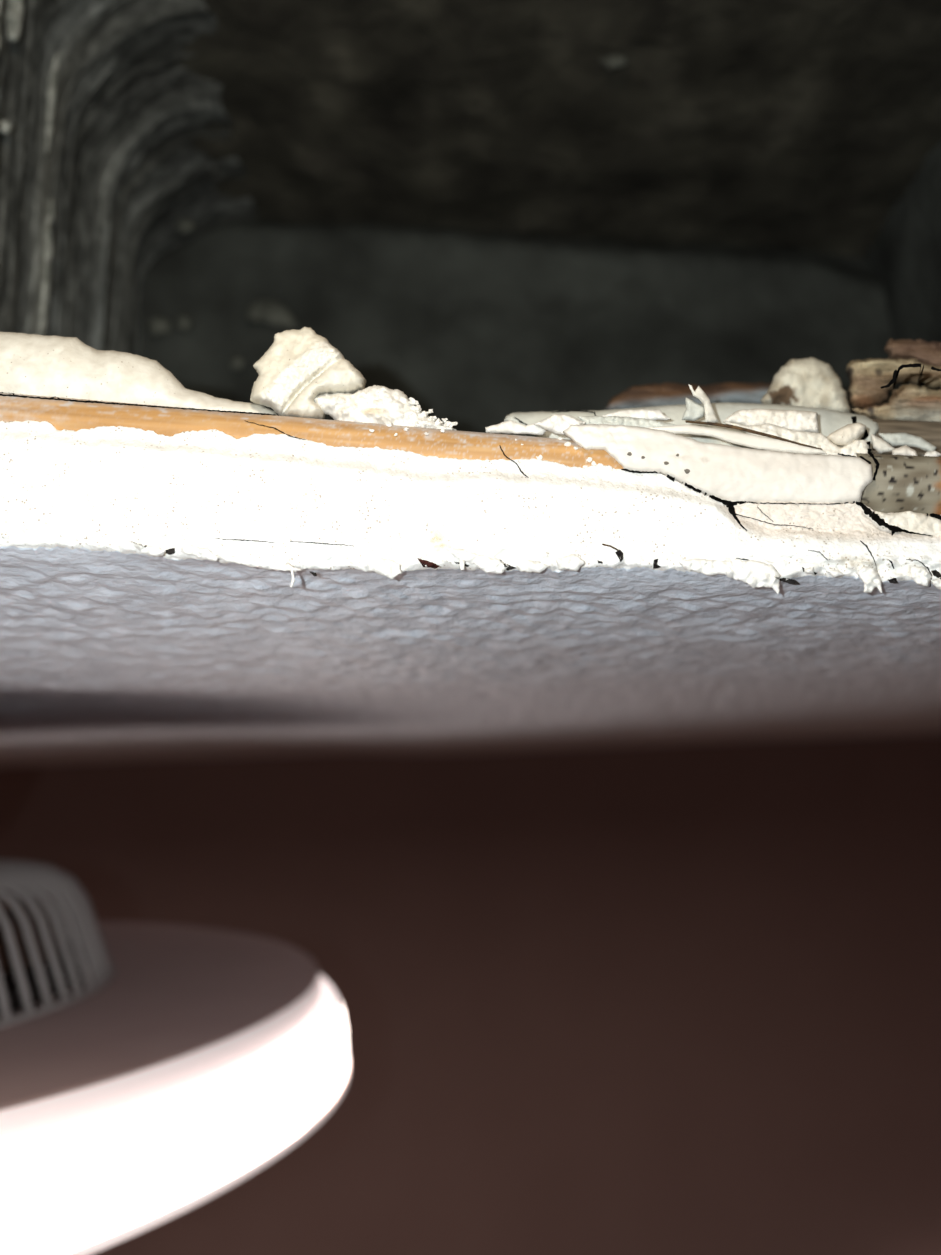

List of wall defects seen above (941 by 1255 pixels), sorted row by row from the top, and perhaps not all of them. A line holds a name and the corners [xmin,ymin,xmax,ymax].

crack [880,363,941,389]
peeling [688,384,719,423]
crack [500,446,529,478]
crack [621,416,941,586]
peeling [128,540,317,588]
peeling [366,556,402,580]
peeling [417,558,440,569]
peeling [445,548,603,574]
peeling [677,559,941,594]